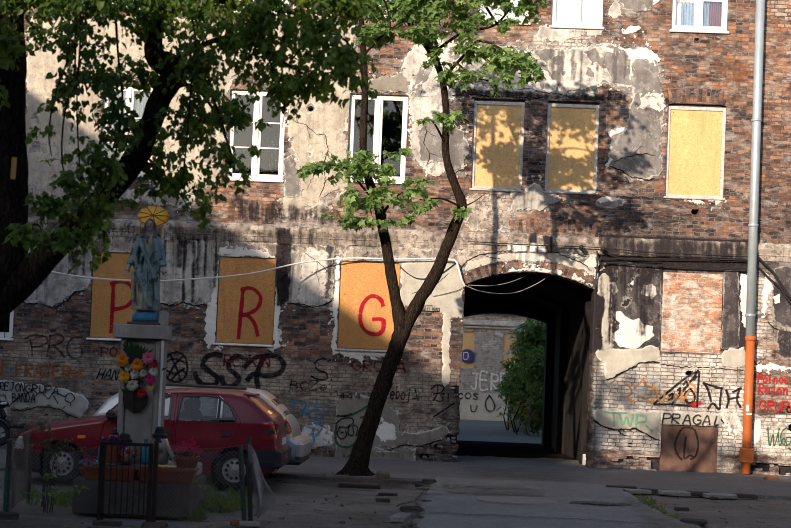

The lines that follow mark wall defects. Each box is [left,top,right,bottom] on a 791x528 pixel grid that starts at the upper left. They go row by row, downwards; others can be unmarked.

peeling [119,0,670,224]
crack [610,146,656,181]
peeling [464,175,566,234]
peeling [108,236,137,253]
water stain [158,228,231,302]
peeling [160,238,386,364]
peeling [392,247,440,307]
peeling [425,249,662,397]
water stain [594,232,748,350]
peeling [301,391,369,458]
peeling [370,395,457,461]